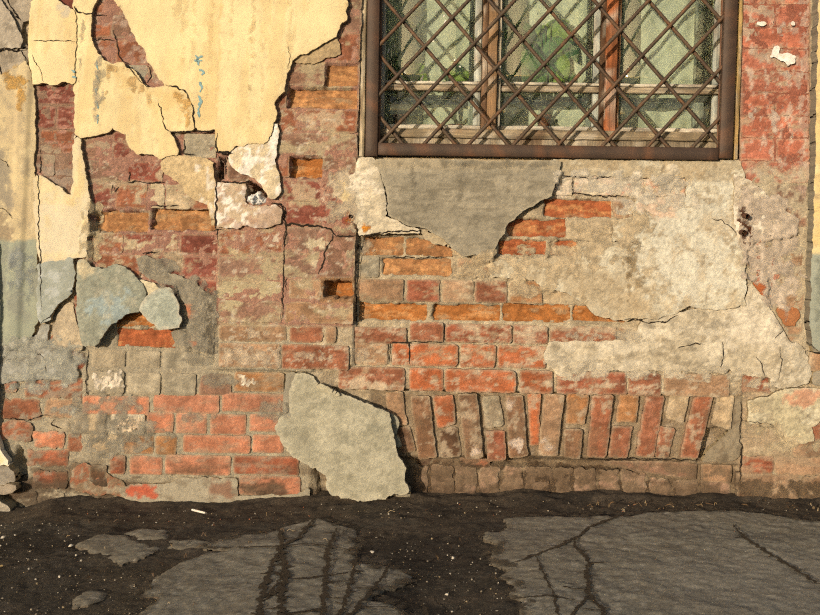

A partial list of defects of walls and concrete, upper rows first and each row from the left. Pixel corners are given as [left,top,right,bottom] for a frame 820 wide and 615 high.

crack [0,40,73,81]
spalling [93,0,164,86]
crack [74,6,247,246]
spalling [337,0,362,62]
spalling [740,0,810,227]
crack [37,149,54,323]
spalling [0,63,820,505]